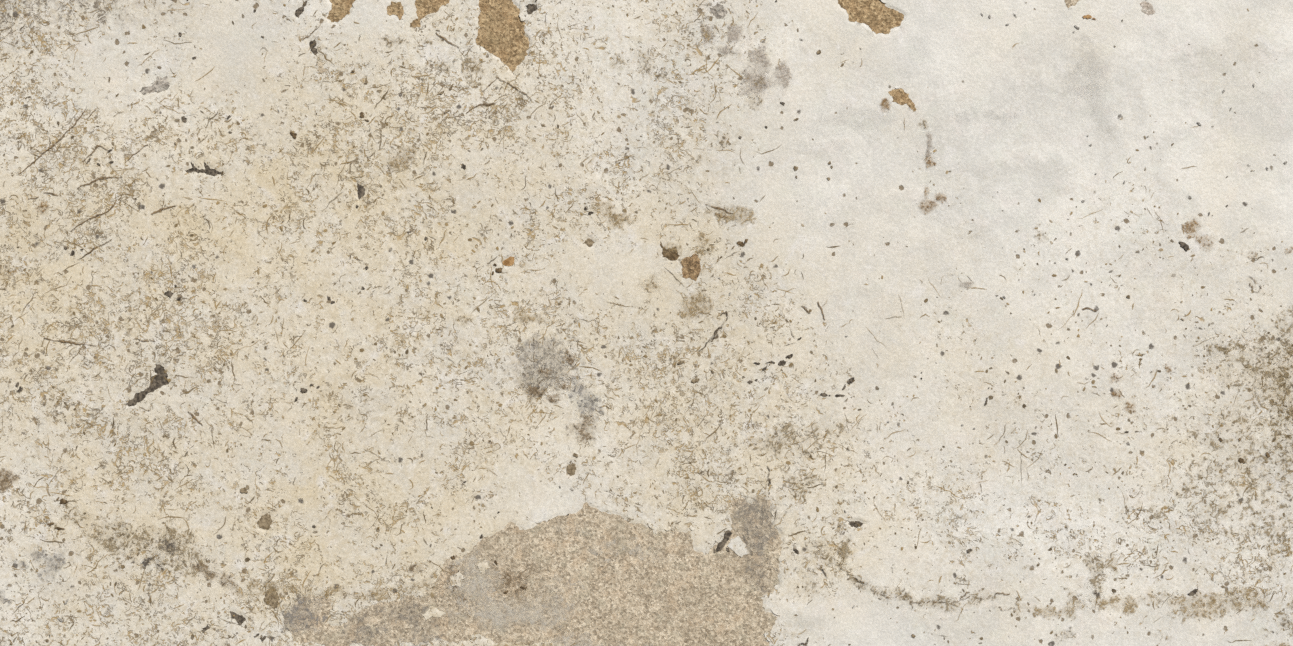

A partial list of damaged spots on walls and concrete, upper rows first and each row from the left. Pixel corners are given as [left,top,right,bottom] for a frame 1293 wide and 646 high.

peeling [323,0,359,22]
peeling [387,0,450,27]
spalling [838,0,907,37]
spalling [474,0,537,75]
spalling [888,86,916,111]
spalling [257,513,273,530]
spalling [264,495,799,646]
spalling [230,611,246,625]